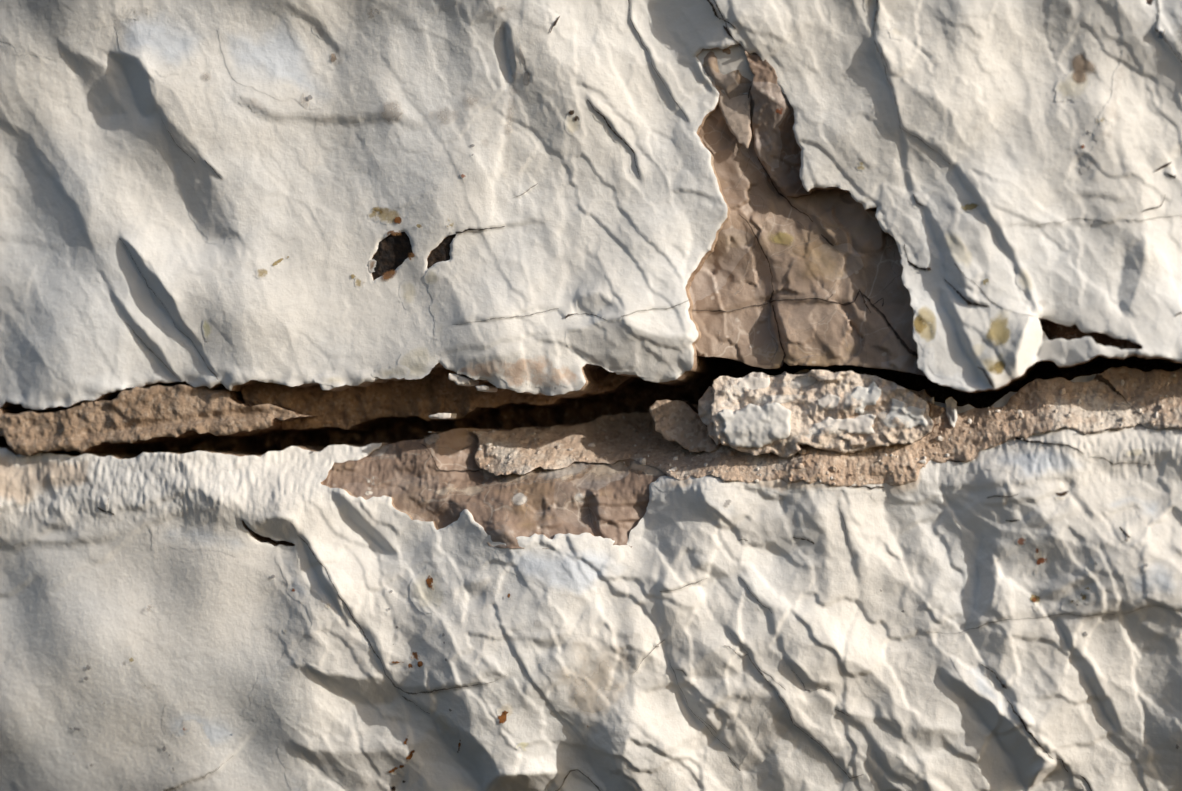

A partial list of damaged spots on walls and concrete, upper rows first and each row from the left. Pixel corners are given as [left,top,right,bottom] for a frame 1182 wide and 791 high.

crack [873,0,947,162]
spalling [372,232,413,280]
spalling [427,234,456,269]
spalling [565,48,928,448]
crack [79,214,1182,472]
peeling [448,373,498,392]
spalling [945,397,958,428]
spalling [322,413,668,549]
spalling [736,498,803,559]